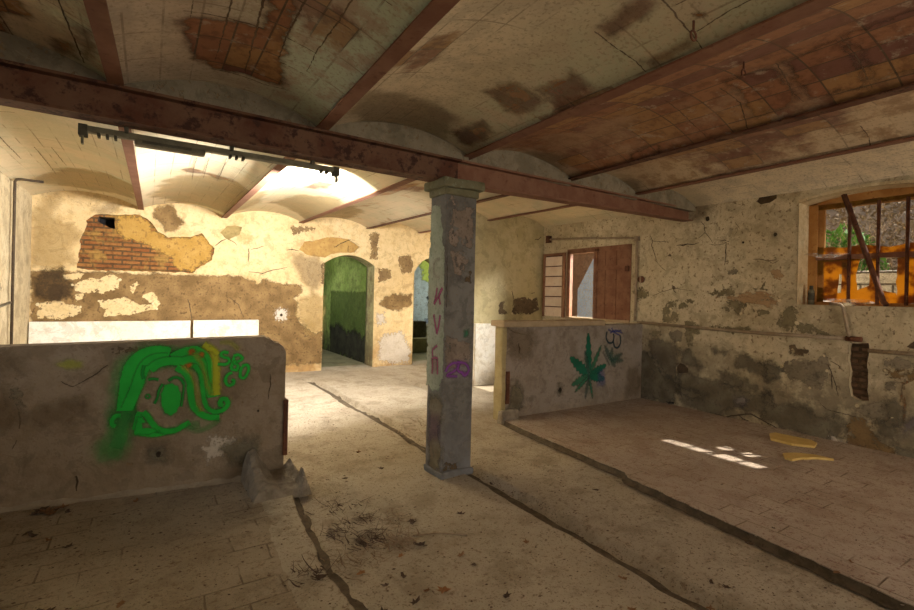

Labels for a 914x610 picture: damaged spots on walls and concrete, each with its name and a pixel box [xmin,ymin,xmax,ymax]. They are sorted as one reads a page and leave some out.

crack [190,0,265,72]
peeling [181,0,297,85]
crack [278,0,353,70]
spalling [36,214,215,320]
damp [30,267,413,366]
damp [641,338,847,442]
spalling [848,343,869,401]
peeling [884,357,914,394]